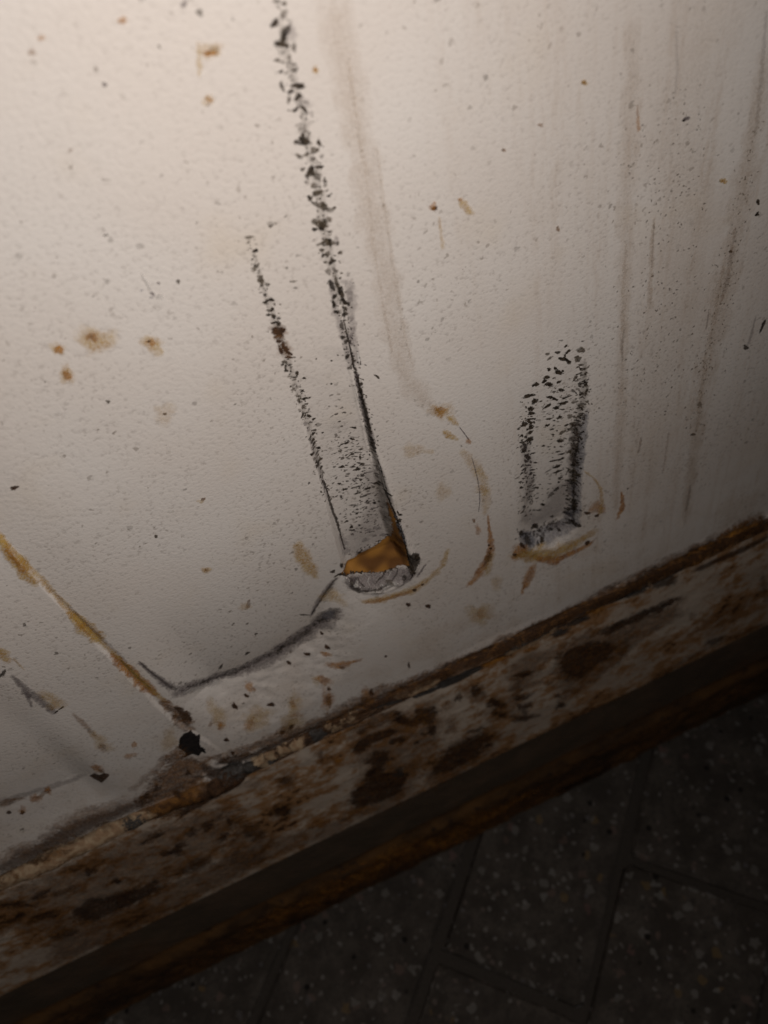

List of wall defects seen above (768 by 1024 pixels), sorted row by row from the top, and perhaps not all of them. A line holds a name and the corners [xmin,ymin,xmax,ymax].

water stain [337,291,377,453]
water stain [324,481,345,549]
crack [140,612,337,694]
corrosion [0,517,768,869]
peeling [179,730,206,757]